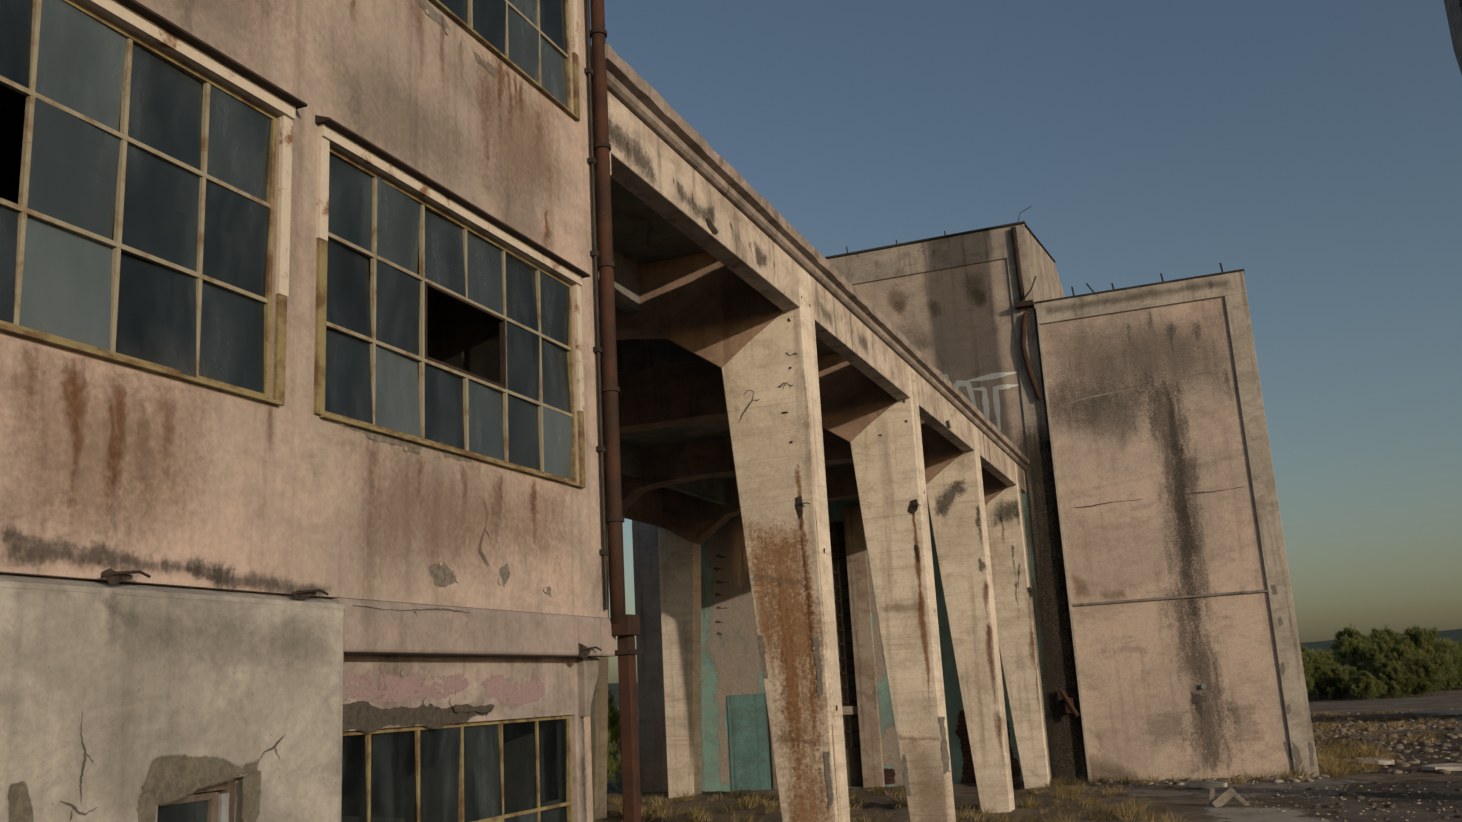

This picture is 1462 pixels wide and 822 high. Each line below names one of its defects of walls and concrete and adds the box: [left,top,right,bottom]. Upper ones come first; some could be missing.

corrosion [65,371,82,456]
flaking render [429,561,460,587]
peeling [704,517,768,785]
corrosion [749,512,839,822]
flaking render [908,491,925,515]
corrosion [912,513,930,681]
water stain [976,421,1088,782]
water stain [1056,327,1229,769]
crack [60,712,97,821]
flaking render [138,754,261,822]
flaking render [938,710,976,783]
flaking render [1006,720,1021,782]